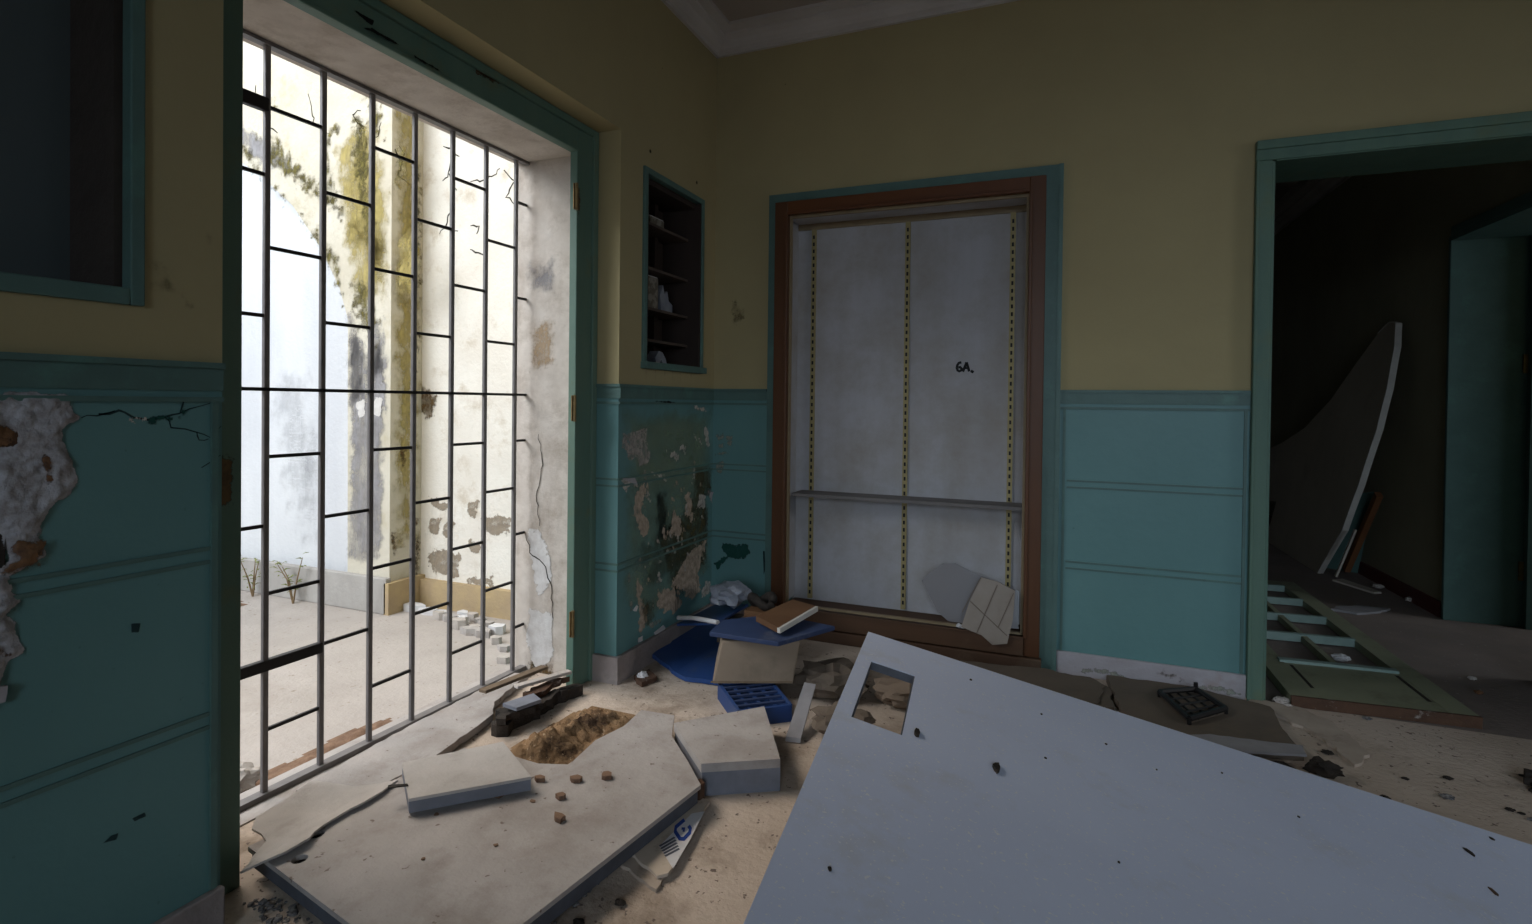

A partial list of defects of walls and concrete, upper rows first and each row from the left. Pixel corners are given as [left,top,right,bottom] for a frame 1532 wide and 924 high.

flaking render [0,391,80,703]
crack [81,402,221,468]
leakage [243,106,421,575]
peeling [622,405,750,642]